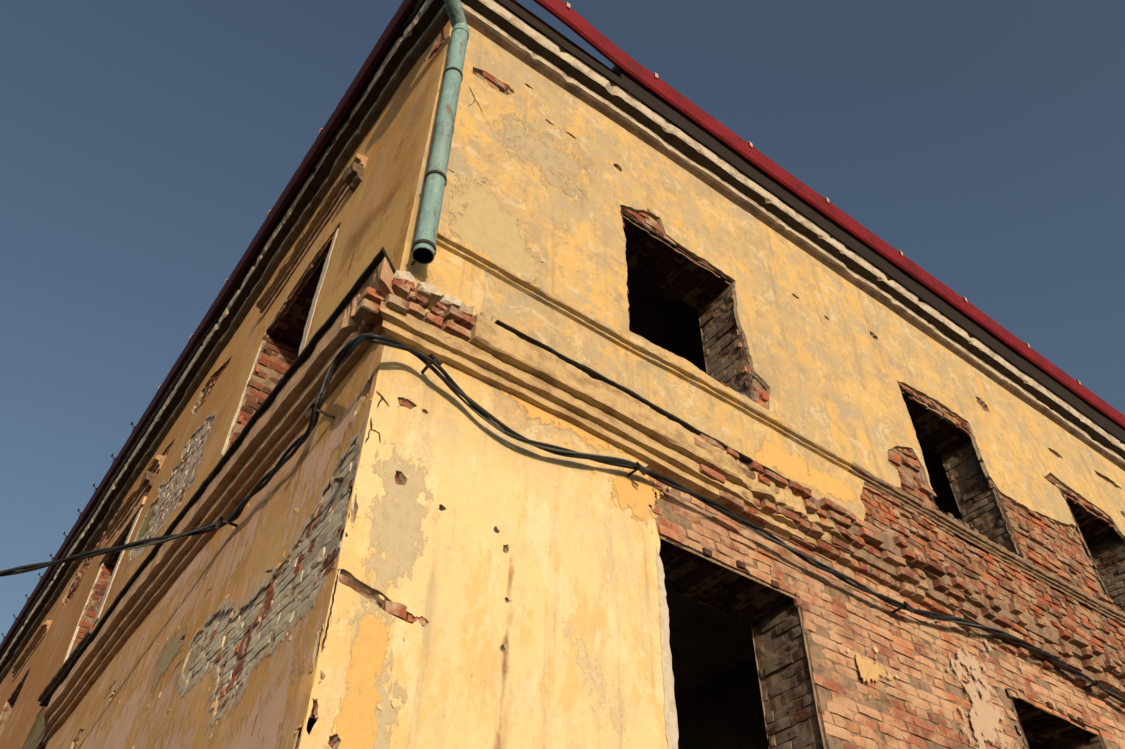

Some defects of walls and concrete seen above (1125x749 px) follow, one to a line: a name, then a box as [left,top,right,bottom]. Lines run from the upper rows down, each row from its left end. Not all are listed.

spalling [424,29,445,61]
spalling [472,67,532,95]
flaking render [62,345,239,606]
flaking render [99,370,430,749]
flaking render [498,381,1125,749]